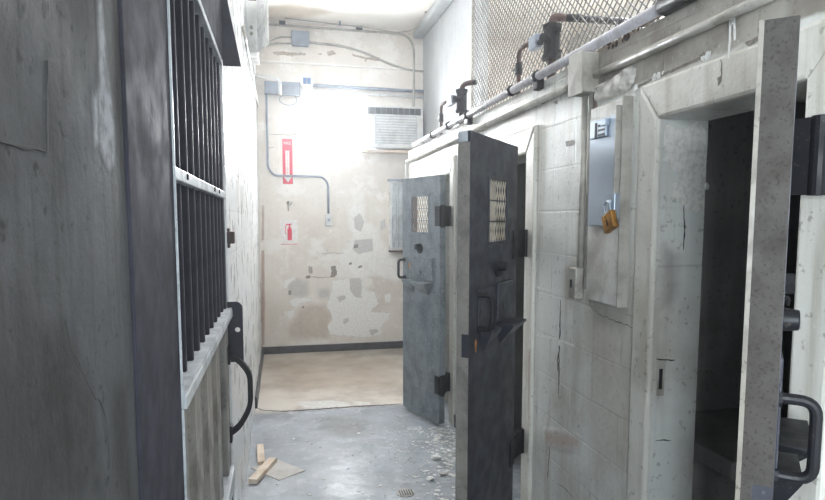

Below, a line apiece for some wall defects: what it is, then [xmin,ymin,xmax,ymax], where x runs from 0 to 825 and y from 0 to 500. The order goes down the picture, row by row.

peeling [327,201,403,338]
crack [555,300,563,392]